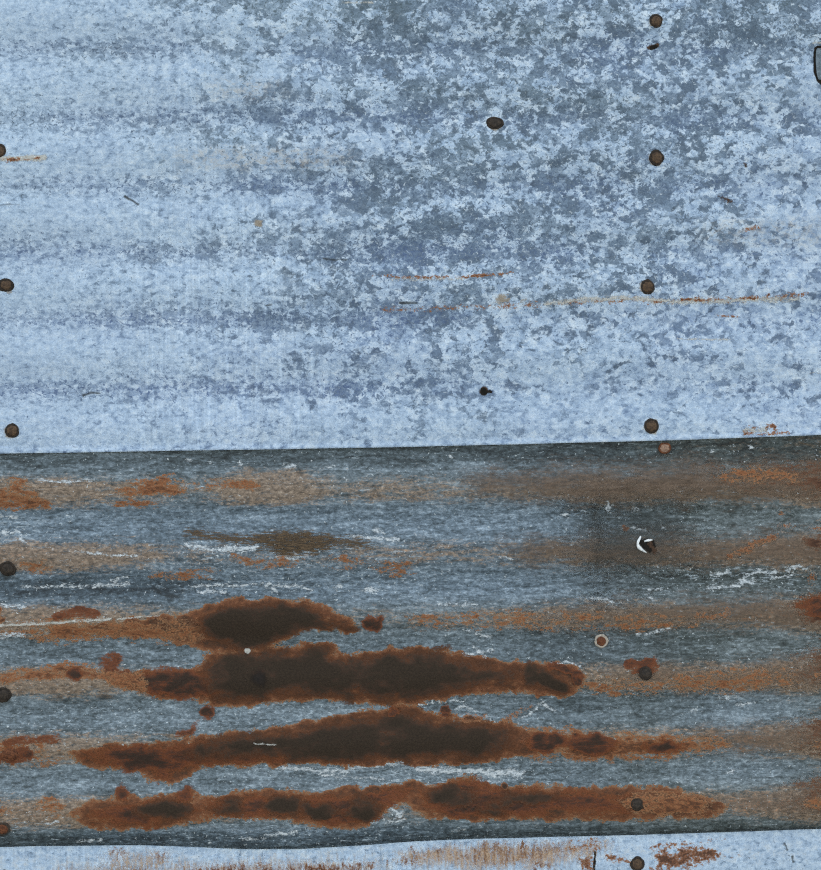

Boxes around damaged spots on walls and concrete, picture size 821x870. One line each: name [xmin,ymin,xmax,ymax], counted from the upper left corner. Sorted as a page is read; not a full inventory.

corrosion [0,154,47,163]
corrosion [113,473,260,509]
corrosion [706,460,821,499]
corrosion [0,477,91,543]
corrosion [184,543,259,552]
corrosion [349,528,400,542]
corrosion [707,511,815,589]
corrosion [22,576,130,589]
corrosion [0,582,821,843]
corrosion [175,862,374,870]
corrosion [387,838,630,870]
corrosion [649,838,739,870]